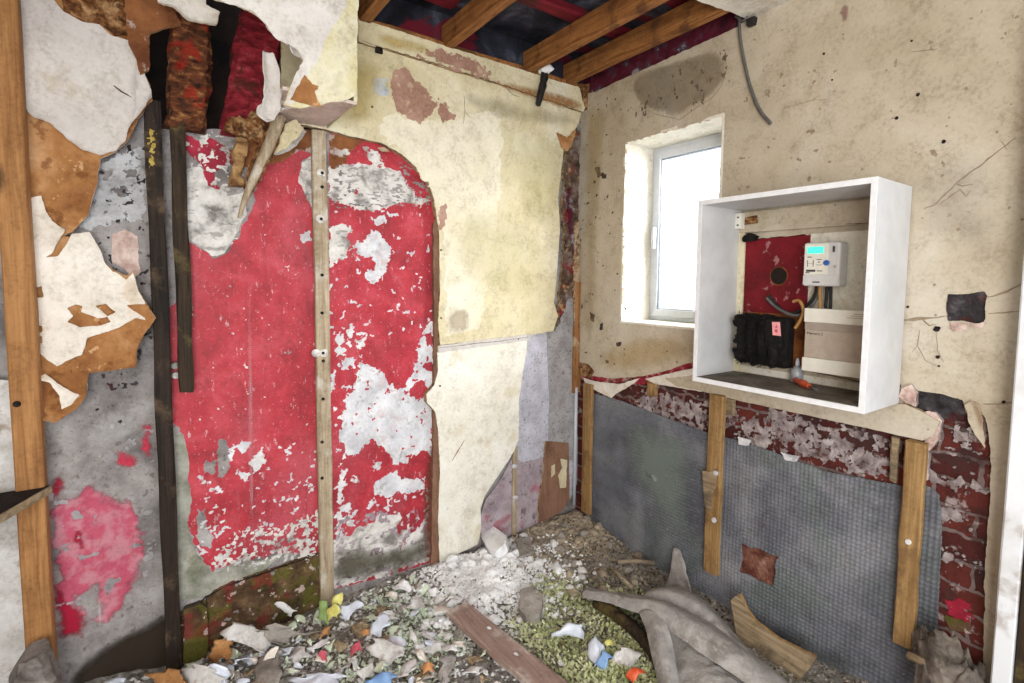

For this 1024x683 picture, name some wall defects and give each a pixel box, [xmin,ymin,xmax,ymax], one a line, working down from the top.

peeling [372,67,456,125]
water stain [628,50,730,117]
peeling [79,145,147,231]
peeling [186,134,247,256]
peeling [298,156,312,207]
crack [924,139,1014,209]
crack [986,283,1022,314]
peeling [327,146,447,590]
crack [904,316,944,364]
flaking render [899,384,986,481]
flaking render [174,434,320,659]
flaking render [740,544,778,586]